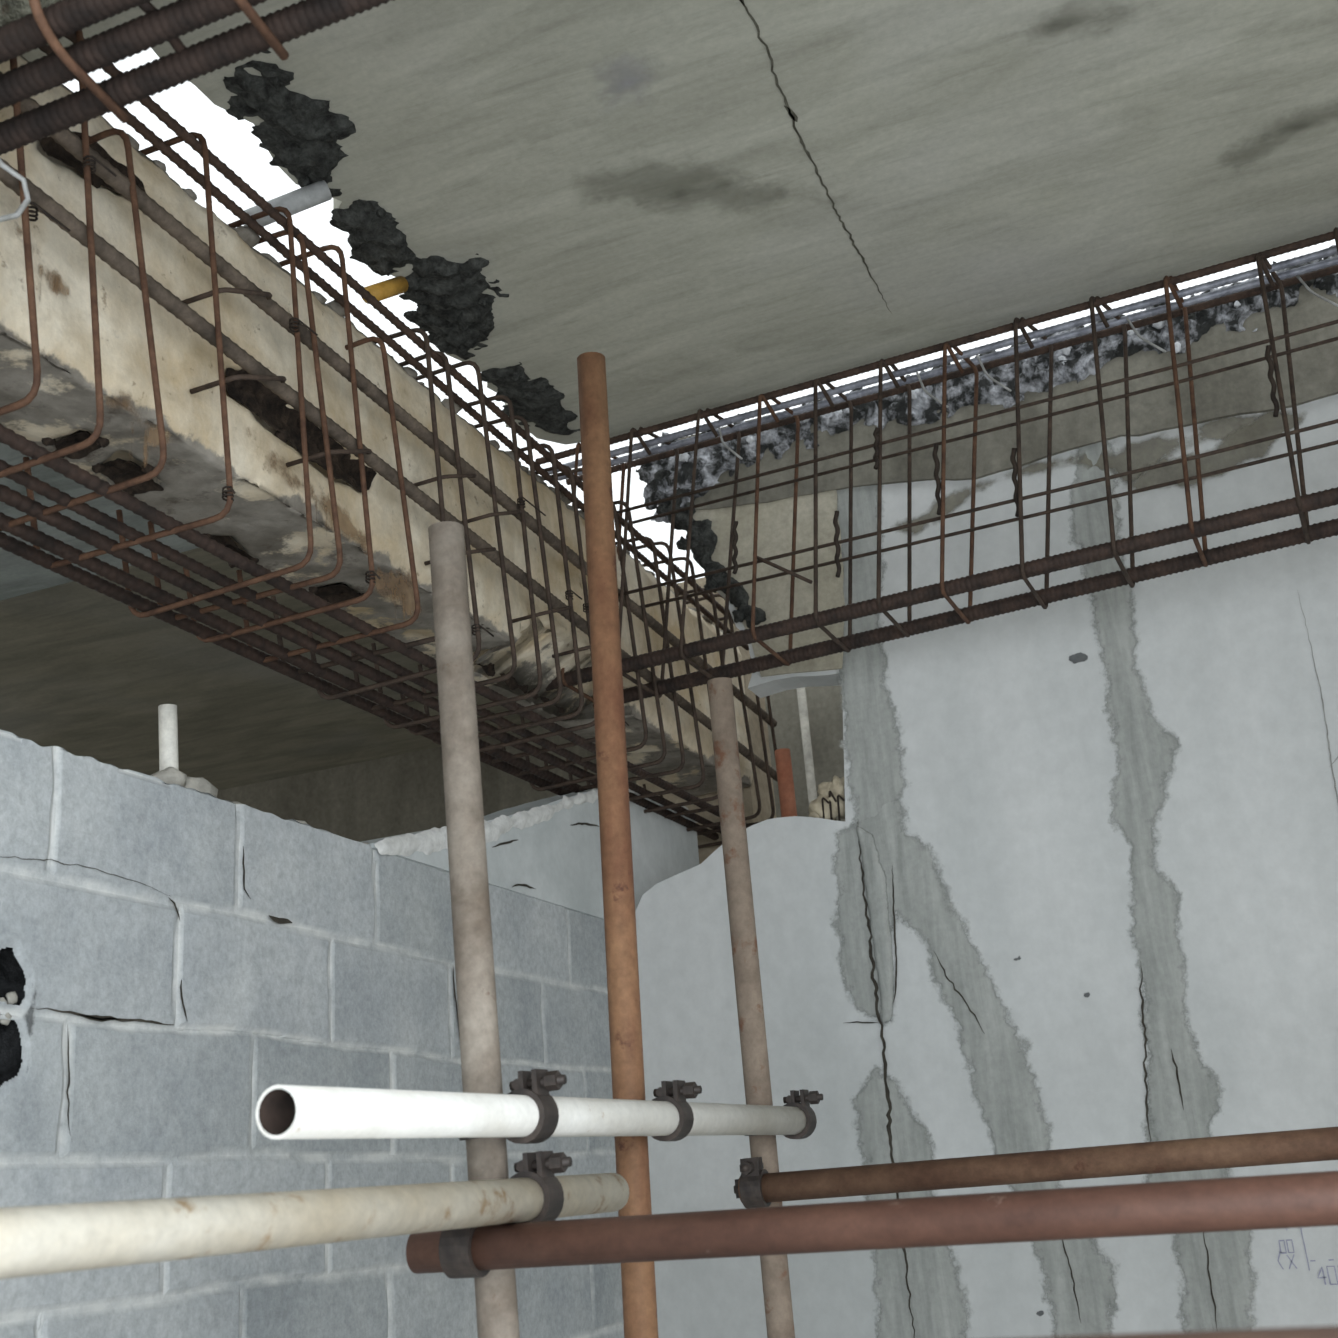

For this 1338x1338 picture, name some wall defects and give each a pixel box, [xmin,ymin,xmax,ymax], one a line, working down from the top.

spalling [223,50,509,360]
crack [739,0,891,312]
spalling [41,430,164,496]
spalling [226,368,377,493]
spalling [481,362,580,435]
spalling [636,245,1338,628]
crack [1297,590,1338,804]
crack [5,856,180,920]
spalling [0,947,26,1087]
crack [846,841,899,1199]
crack [934,952,985,1034]
crack [902,1248,915,1338]